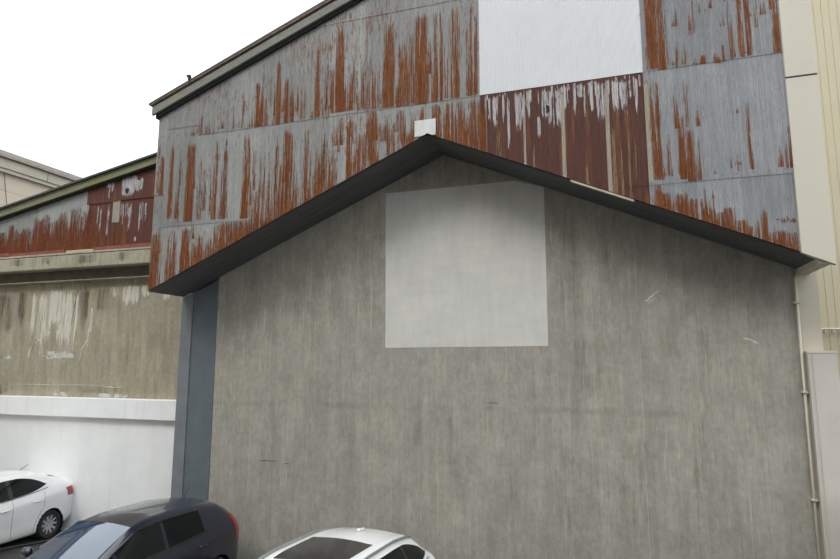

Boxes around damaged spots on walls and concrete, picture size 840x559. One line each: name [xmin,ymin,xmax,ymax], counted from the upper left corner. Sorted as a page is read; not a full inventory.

rust [644,0,781,70]
rust [0,8,501,291]
rust [611,129,637,198]
rust [646,81,799,251]
leakage [18,289,93,359]
leakage [100,284,151,306]